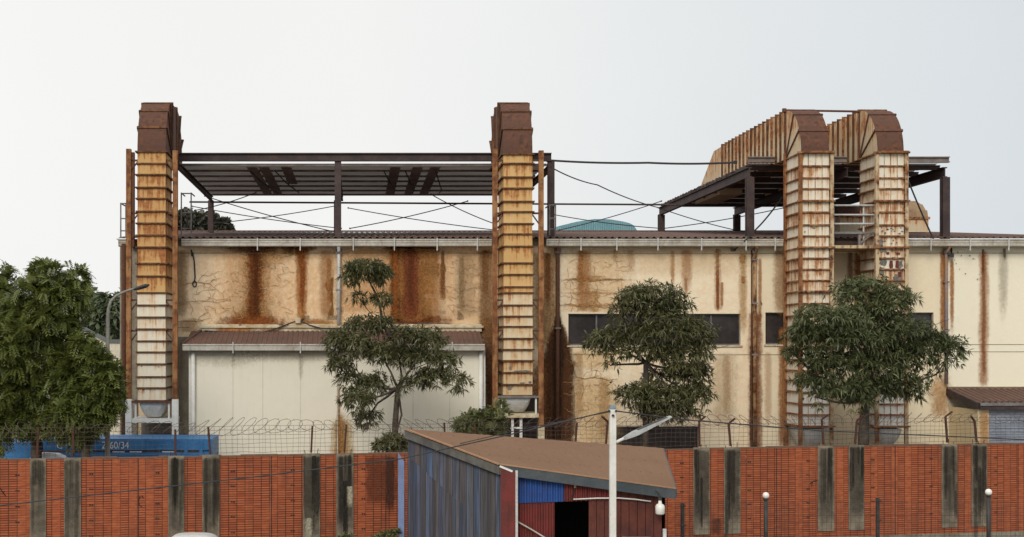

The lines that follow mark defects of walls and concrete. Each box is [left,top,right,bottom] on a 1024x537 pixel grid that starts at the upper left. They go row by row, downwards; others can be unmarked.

crack [178,256,297,322]
rust [218,247,332,331]
rust [386,247,446,324]
rust [578,251,598,311]
rust [980,249,988,383]